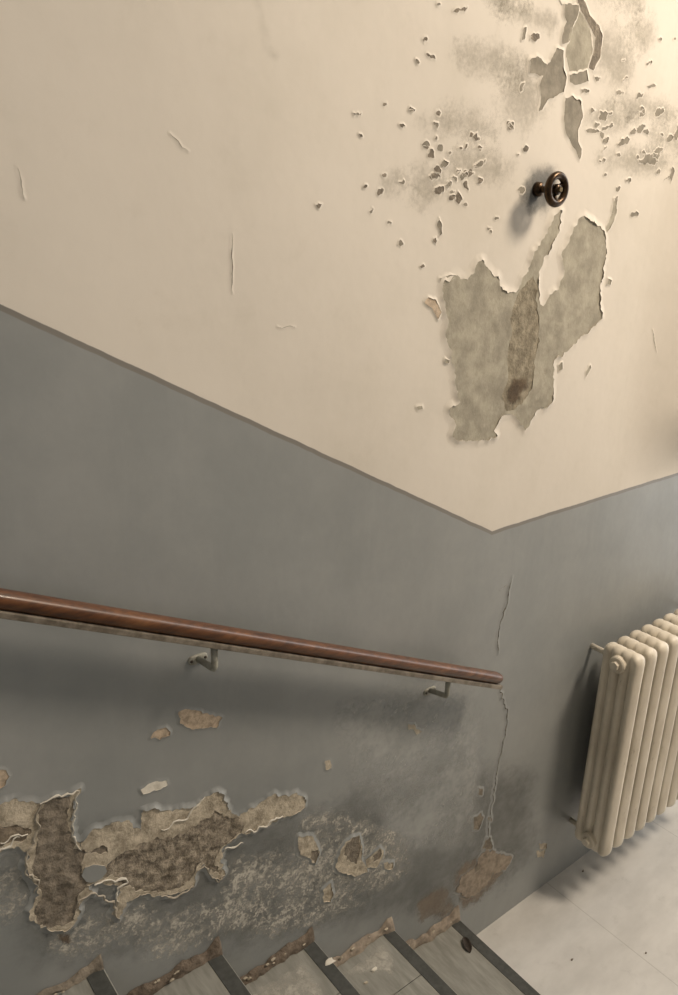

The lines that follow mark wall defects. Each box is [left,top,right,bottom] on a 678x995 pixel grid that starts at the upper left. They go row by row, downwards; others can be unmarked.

peeling [526,0,604,163]
peeling [422,199,618,448]
crack [494,574,515,656]
peeling [147,705,225,742]
crack [485,682,510,840]
spalling [0,765,308,935]
leakage [50,684,473,958]
spalling [294,831,323,866]
spalling [319,831,396,905]
peeling [127,936,223,995]
peeling [240,927,315,985]
peeling [325,917,395,967]